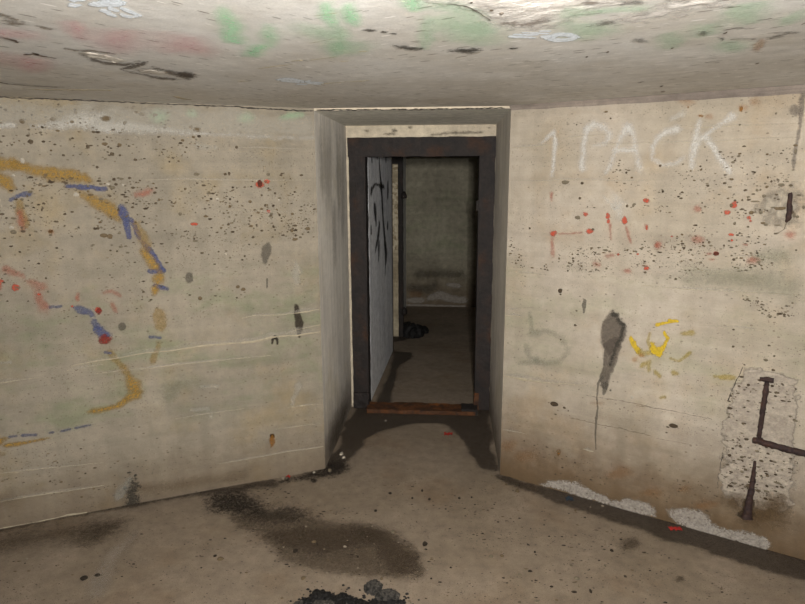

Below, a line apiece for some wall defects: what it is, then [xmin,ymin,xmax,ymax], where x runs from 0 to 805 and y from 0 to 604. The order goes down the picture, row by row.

rust [785,192,793,223]
damp [377,336,412,403]
damp [595,310,626,450]
spalling [647,345,801,515]
rust [752,377,805,457]
damp [327,408,805,579]
rust [741,461,756,520]